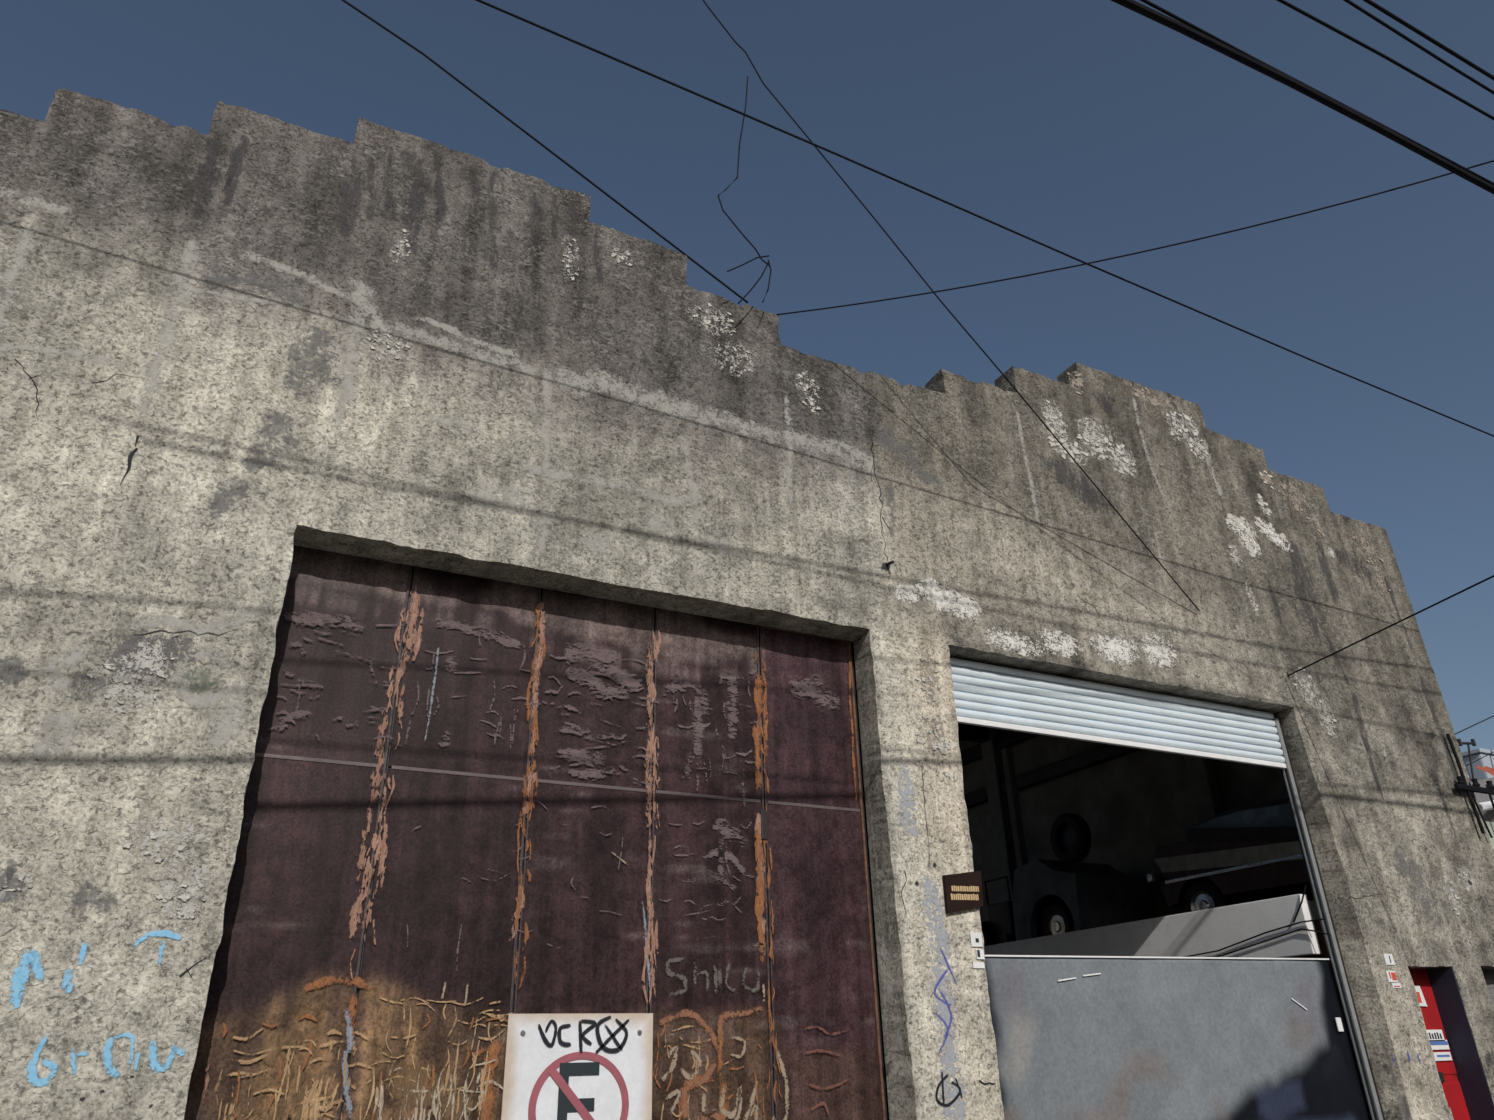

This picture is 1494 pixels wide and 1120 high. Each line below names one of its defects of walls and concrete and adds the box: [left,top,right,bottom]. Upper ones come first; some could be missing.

damp [190,135,249,217]
damp [340,147,445,253]
damp [141,240,942,535]
crack [120,435,140,484]
damp [1016,411,1039,519]
damp [1170,405,1223,498]
corrosion [398,591,424,677]
corrosion [521,602,547,814]
corrosion [752,672,769,789]
corrosion [349,709,388,938]
corrosion [754,813,767,964]
corrosion [389,1038,501,1120]